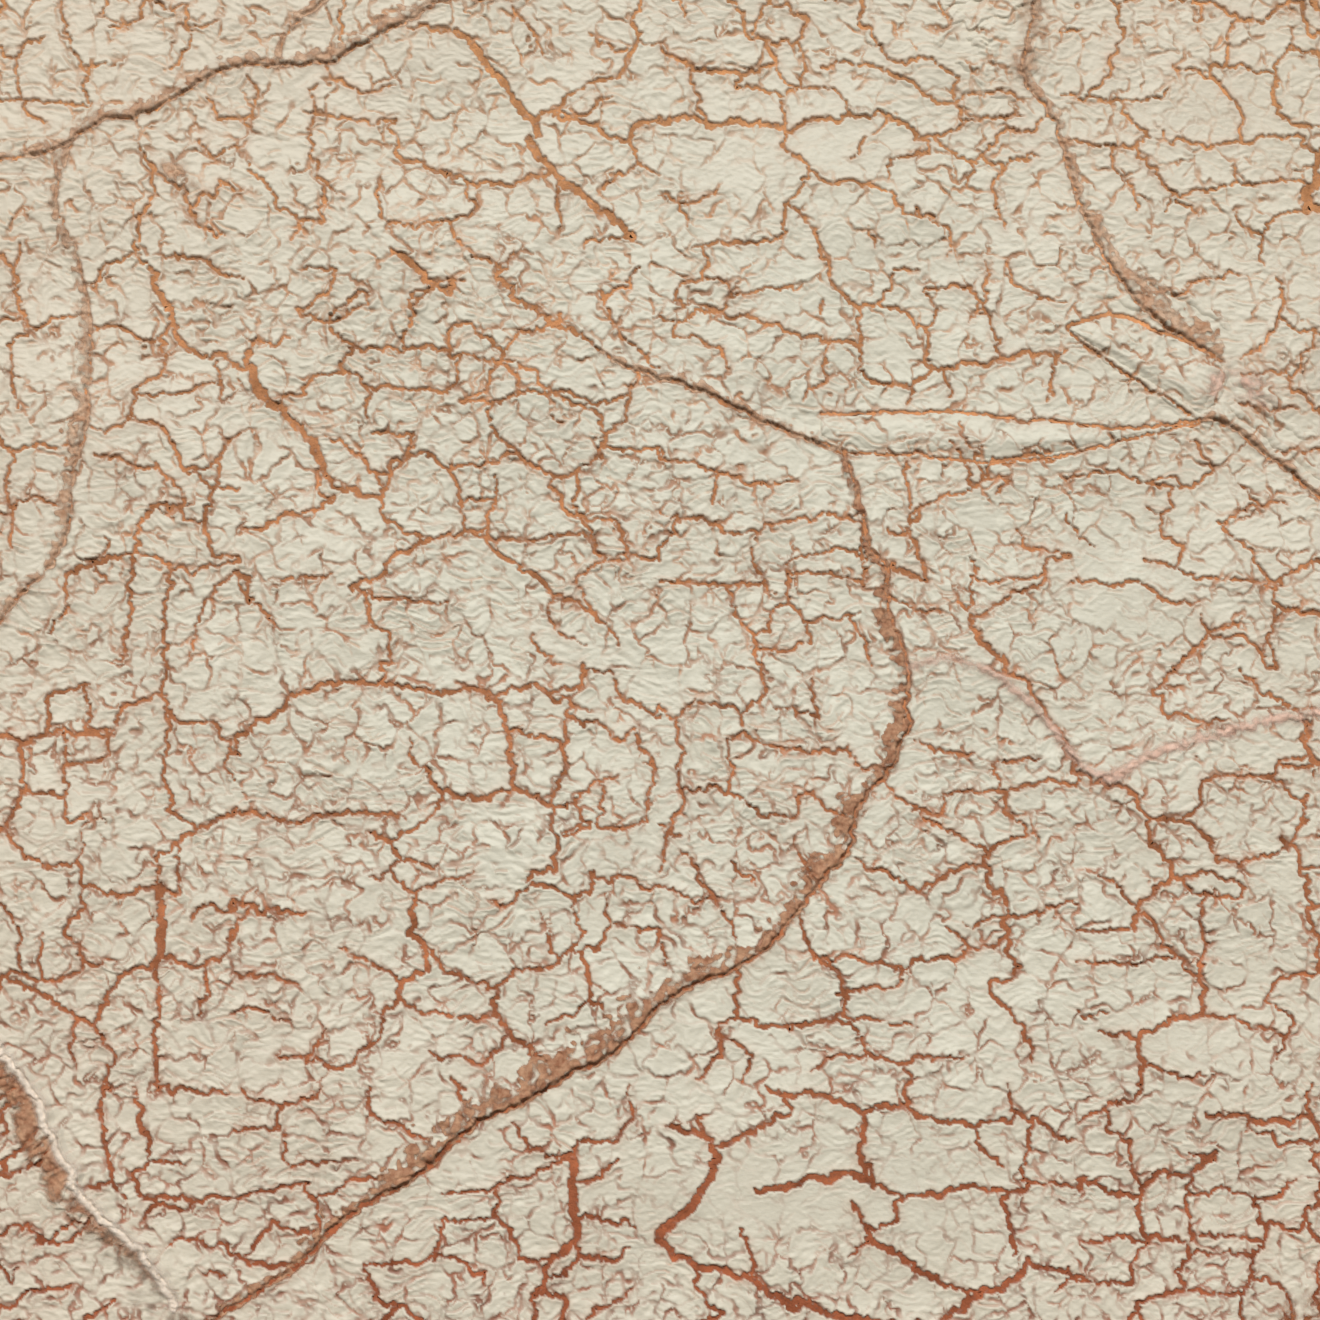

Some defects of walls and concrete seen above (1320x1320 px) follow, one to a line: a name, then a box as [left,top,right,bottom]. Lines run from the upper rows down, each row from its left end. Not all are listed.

crack [1020,0,1320,362]
crack [0,0,1068,908]
crack [1197,278,1320,500]
crack [0,420,399,1199]
crack [131,331,1320,1320]
crack [0,1218,91,1320]
crack [85,1298,116,1320]